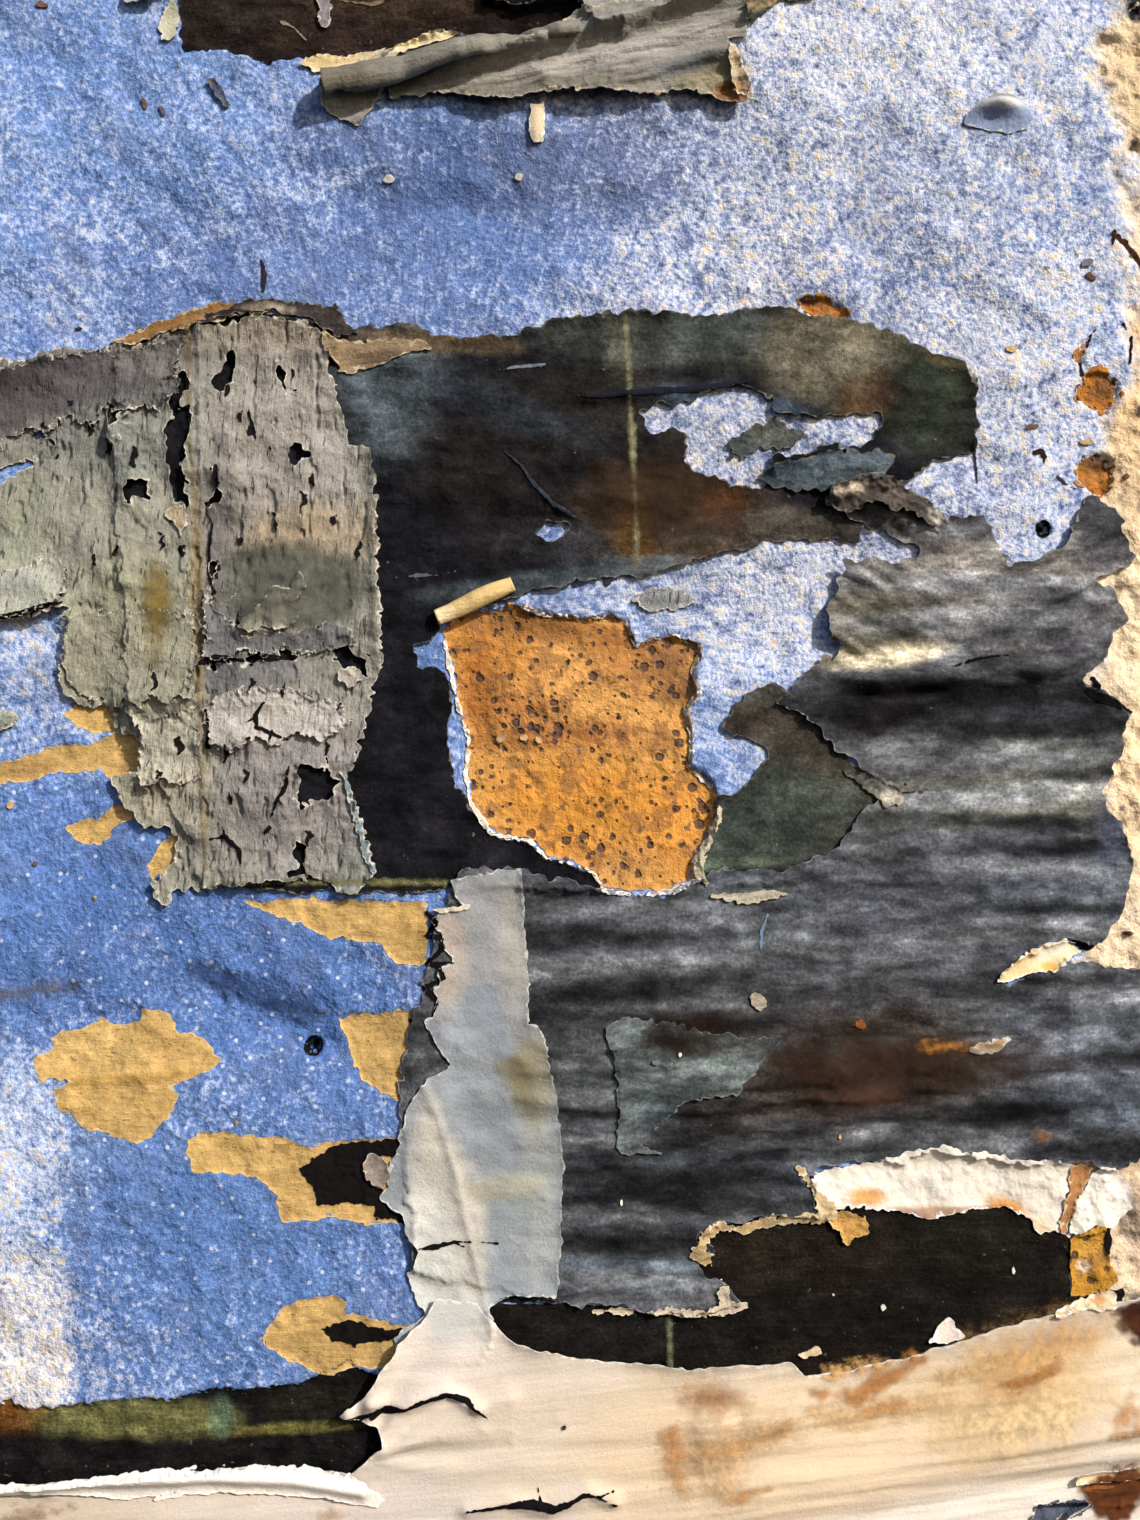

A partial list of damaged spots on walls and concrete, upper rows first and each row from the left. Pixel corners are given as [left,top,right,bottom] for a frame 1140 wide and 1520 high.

flaking render [797,292,851,317]
flaking render [1073,342,1125,415]
flaking render [1074,454,1116,498]
flaking render [443,602,717,897]
peeling [433,904,470,913]
peeling [997,938,1081,982]
peeling [750,992,767,1011]
peeling [969,1036,1012,1055]
peeling [363,1153,390,1189]
peeling [811,1144,1133,1296]
peeling [928,1317,965,1344]
peeling [798,1346,822,1359]